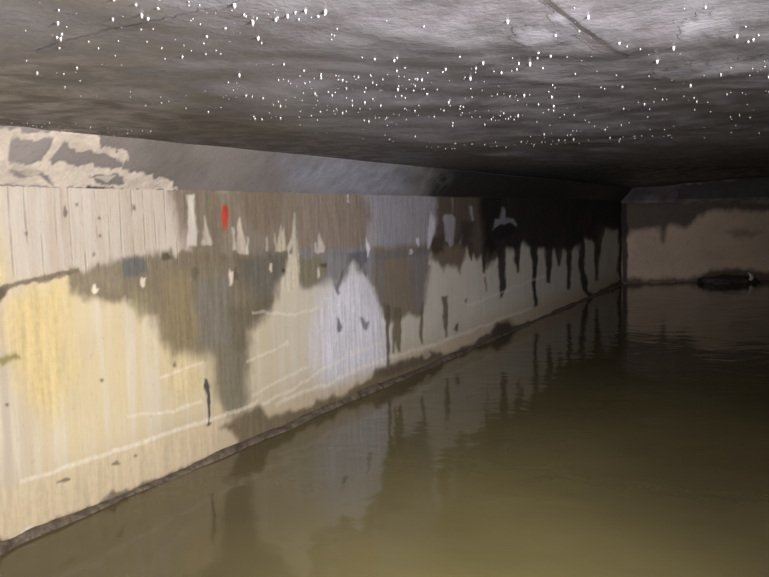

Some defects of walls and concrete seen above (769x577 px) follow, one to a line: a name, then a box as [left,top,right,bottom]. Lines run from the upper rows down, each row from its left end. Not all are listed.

peeling [0,126,180,190]
damp [0,152,769,541]